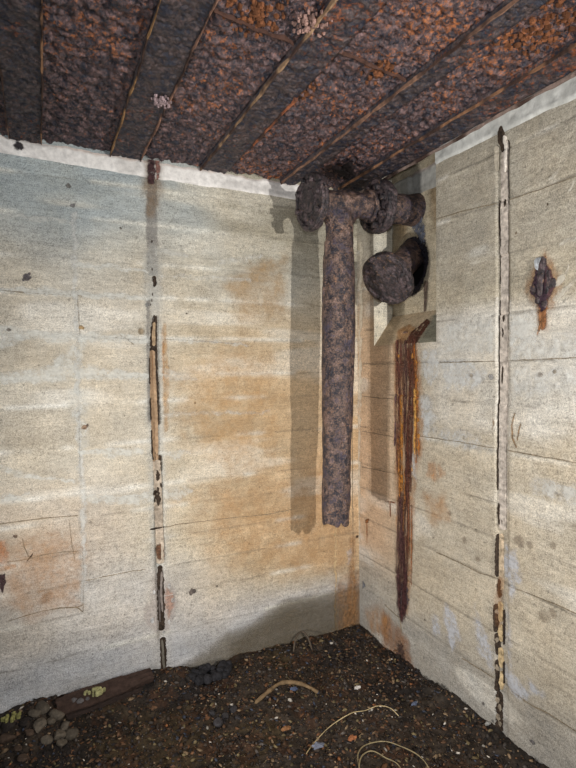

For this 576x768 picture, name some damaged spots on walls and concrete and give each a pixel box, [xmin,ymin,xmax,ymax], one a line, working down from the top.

rust [222,0,289,39]
rust [493,0,576,56]
rust [147,159,160,184]
rust [387,319,431,622]